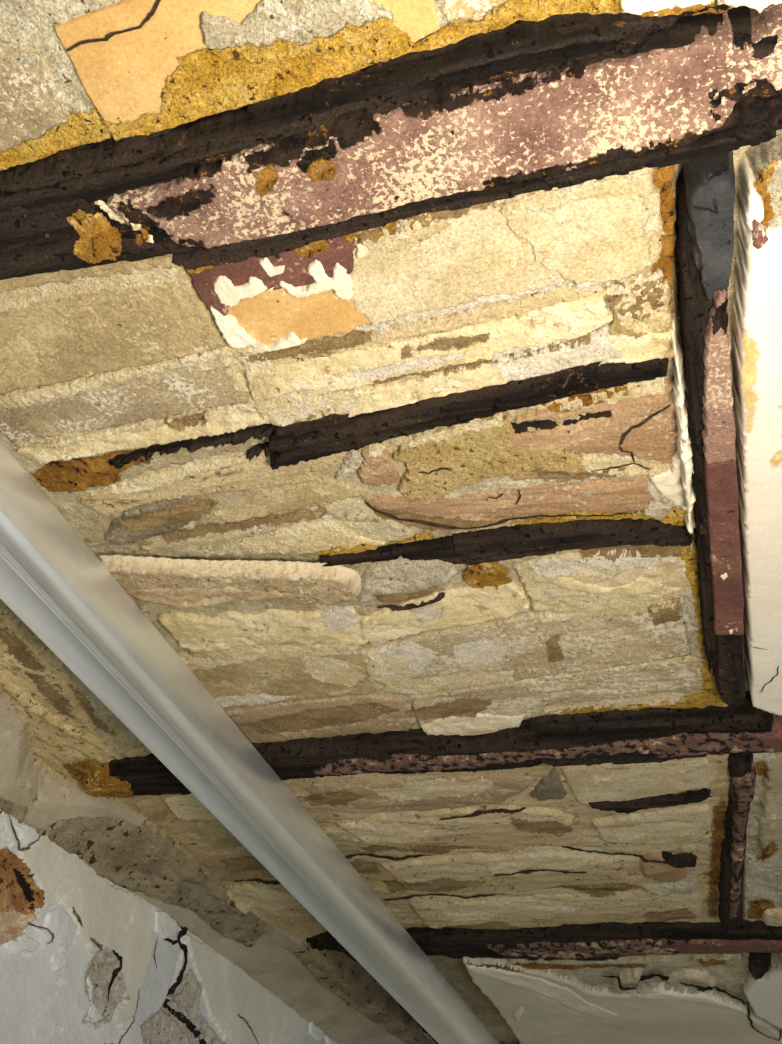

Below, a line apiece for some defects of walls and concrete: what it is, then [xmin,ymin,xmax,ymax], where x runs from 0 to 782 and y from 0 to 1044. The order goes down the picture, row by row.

crack [66,0,161,51]
spalling [0,0,512,152]
rust [0,0,731,279]
rust [31,358,669,493]
spalling [0,164,704,743]
rust [62,759,134,798]
spalling [0,599,327,953]
spalling [283,754,730,930]
crack [104,989,140,1044]
peeling [0,809,336,1044]
crack [154,926,207,1044]
crack [747,1003,781,1041]